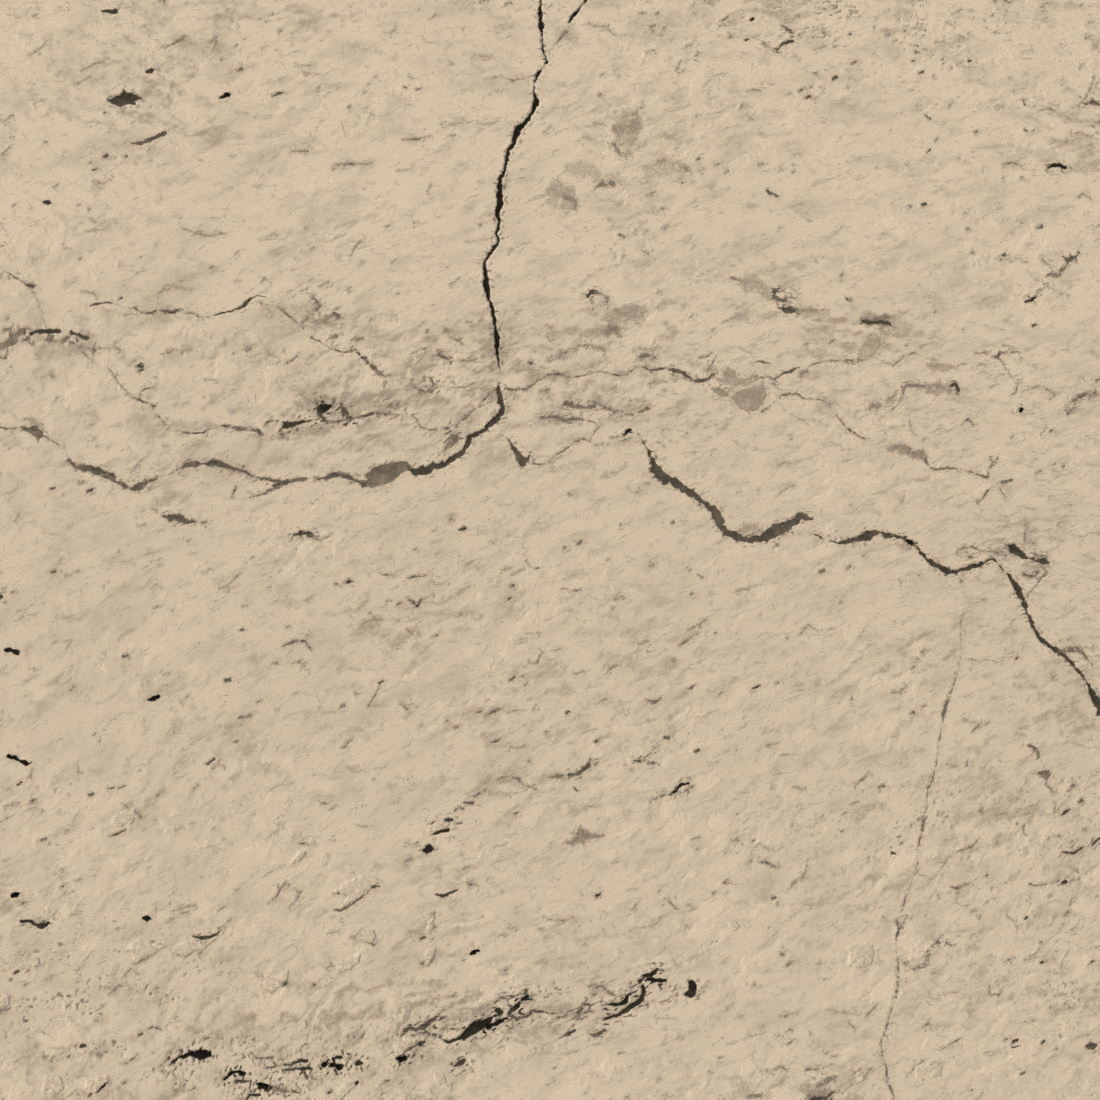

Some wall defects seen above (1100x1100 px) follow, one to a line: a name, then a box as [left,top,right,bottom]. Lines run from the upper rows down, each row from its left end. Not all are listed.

crack [0,0,1100,716]
crack [431,758,597,835]
crack [880,619,1014,1097]